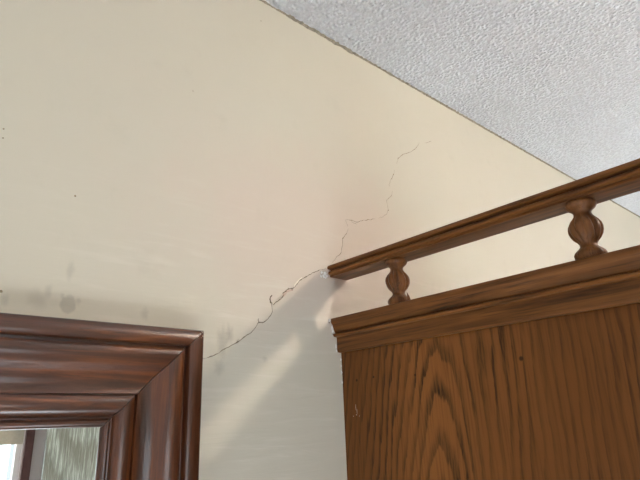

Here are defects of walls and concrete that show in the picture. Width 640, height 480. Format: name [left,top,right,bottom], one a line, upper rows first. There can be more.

crack [203,141,430,359]